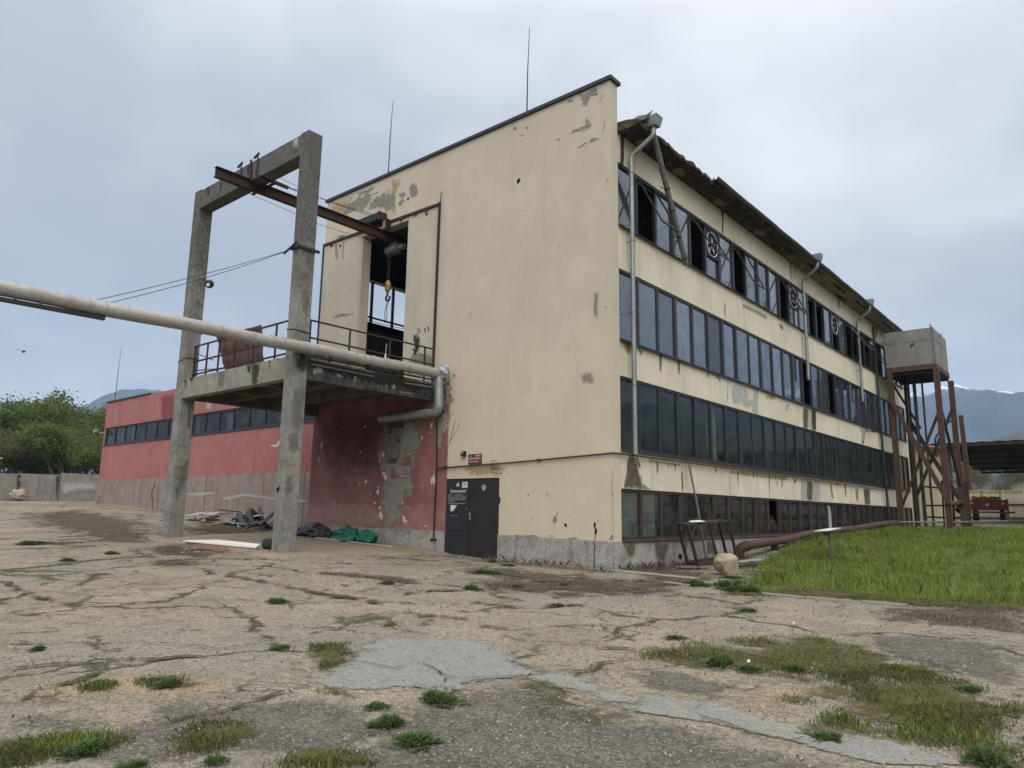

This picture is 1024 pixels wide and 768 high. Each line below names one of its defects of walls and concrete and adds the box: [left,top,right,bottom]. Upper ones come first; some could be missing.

peeling [557,86,605,148]
peeling [344,184,418,215]
peeling [732,384,789,415]
spalling [355,412,422,529]
water stain [624,456,650,490]